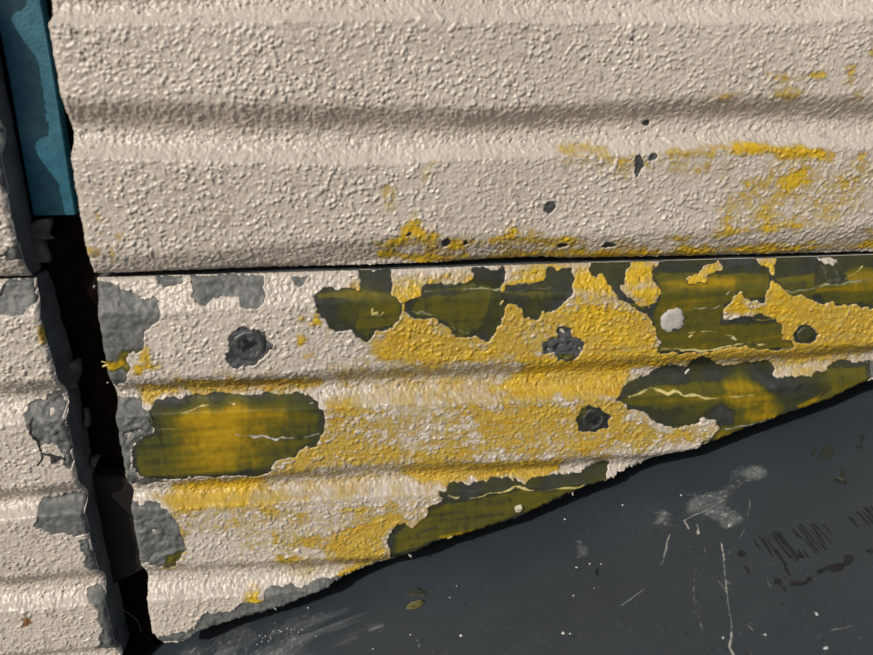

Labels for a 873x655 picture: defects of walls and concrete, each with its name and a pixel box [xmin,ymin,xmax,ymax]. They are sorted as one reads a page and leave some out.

peeling [634,153,658,177]
peeling [0,277,38,317]
peeling [155,273,266,309]
peeling [313,265,575,342]
peeling [93,281,326,485]
peeling [542,327,585,361]
peeling [589,255,873,445]
peeling [23,390,74,470]
peeling [34,491,98,570]
peeling [131,500,187,567]
peeling [387,460,609,557]
peeling [87,583,121,648]